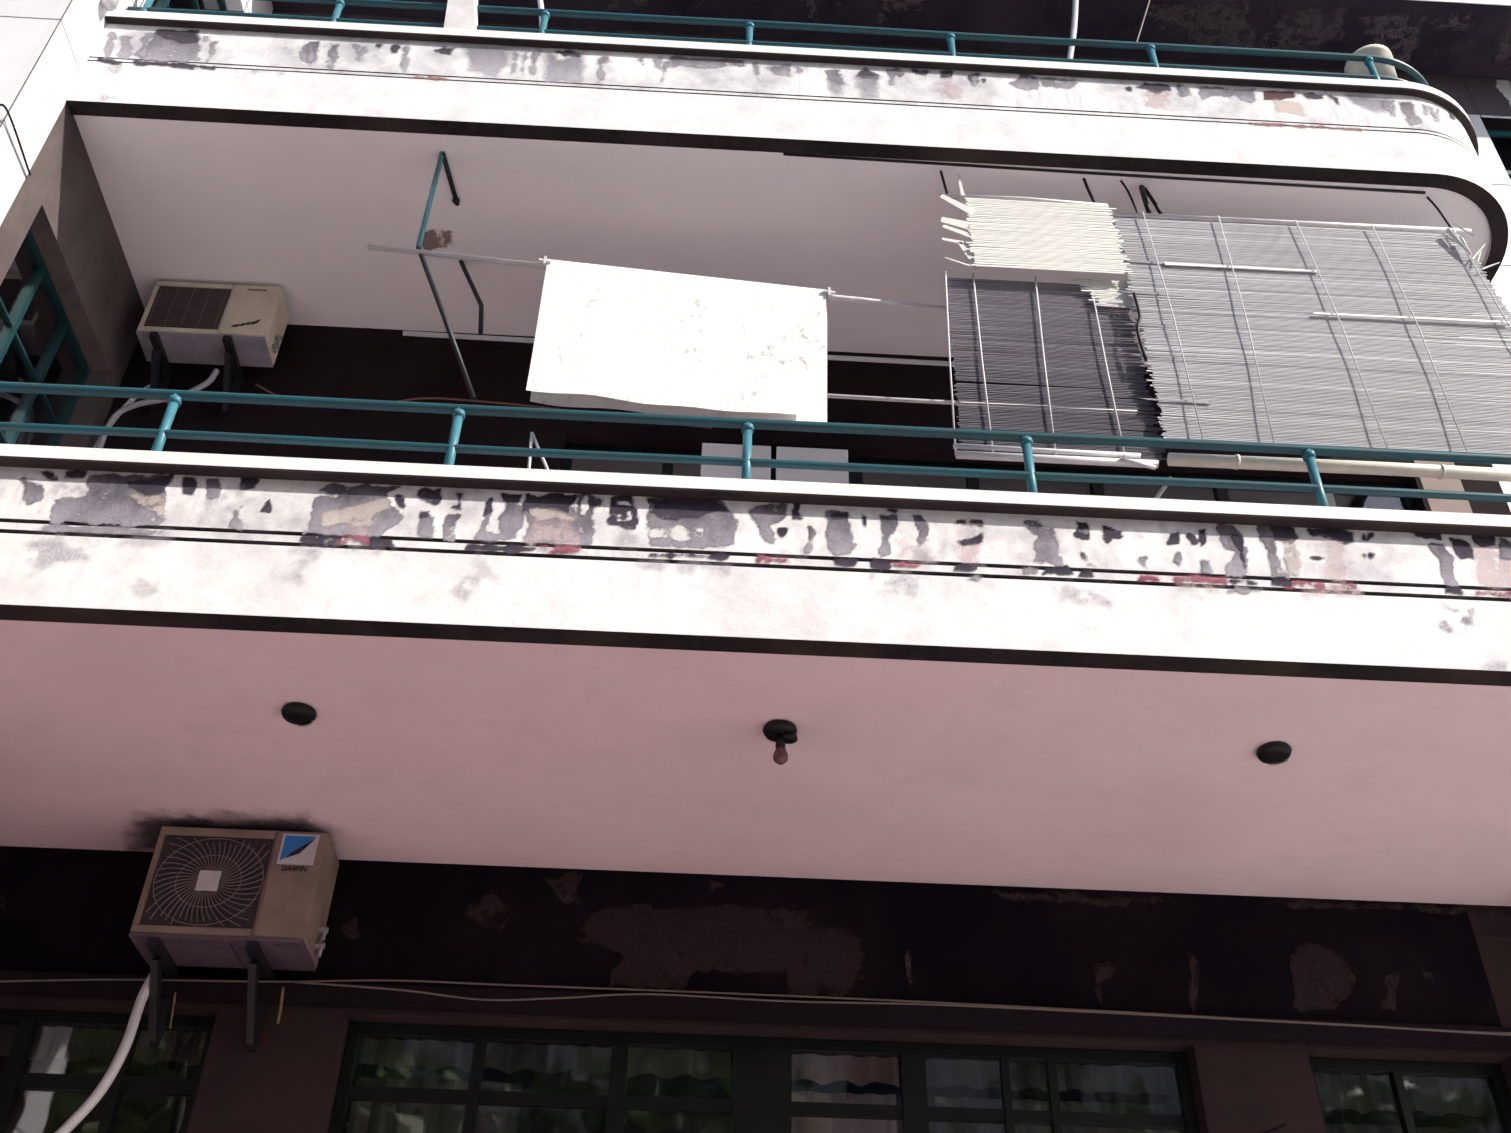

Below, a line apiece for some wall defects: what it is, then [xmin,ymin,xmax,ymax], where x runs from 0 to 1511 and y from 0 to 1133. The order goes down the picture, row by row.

peeling [97,29,218,70]
peeling [300,41,446,81]
peeling [434,47,609,82]
peeling [826,67,986,98]
peeling [1126,82,1456,125]
peeling [20,470,221,534]
peeling [301,483,929,570]
peeling [955,519,984,580]
peeling [1023,520,1123,577]
peeling [1167,524,1375,594]
peeling [1413,533,1511,595]
spalling [1265,898,1511,917]